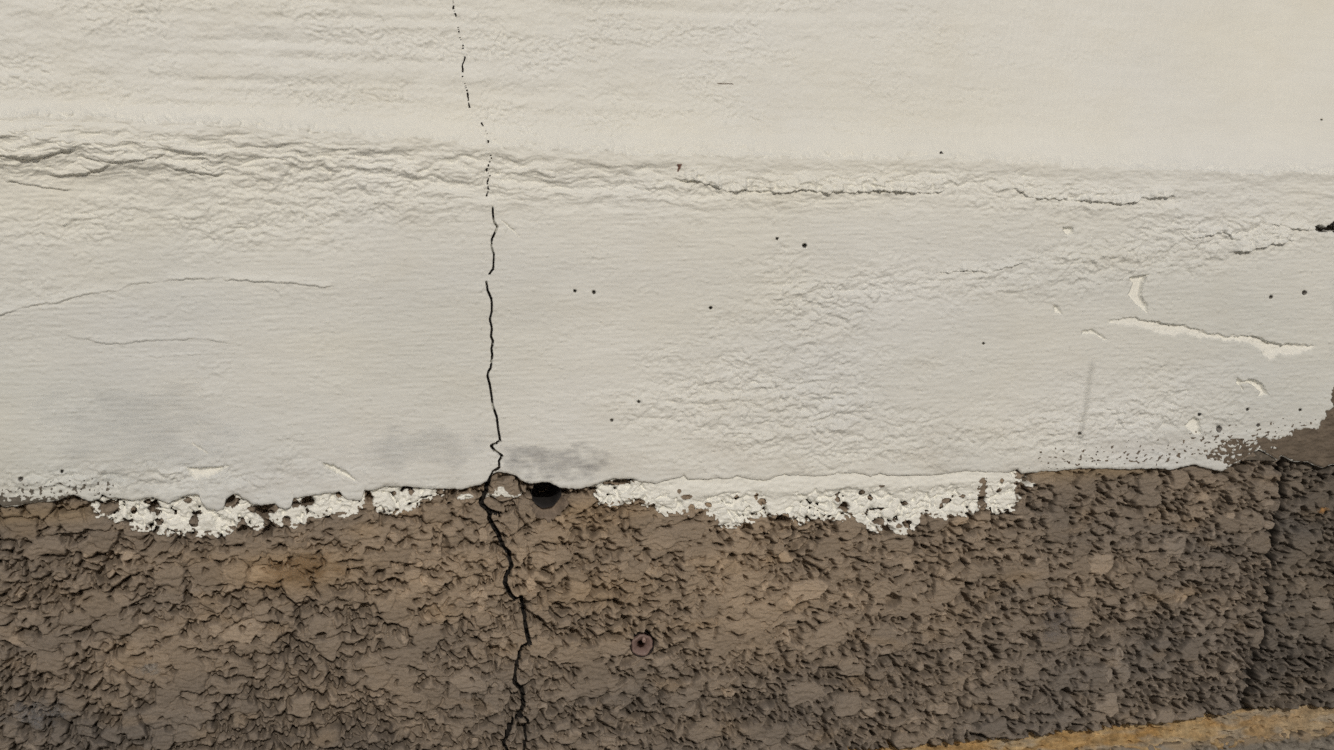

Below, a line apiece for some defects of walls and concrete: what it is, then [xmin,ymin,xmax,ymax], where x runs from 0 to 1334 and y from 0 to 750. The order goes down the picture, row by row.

crack [452,2,532,750]
peeling [1236,378,1269,396]
peeling [1010,387,1334,509]
peeling [0,478,117,518]
spalling [530,495,569,522]